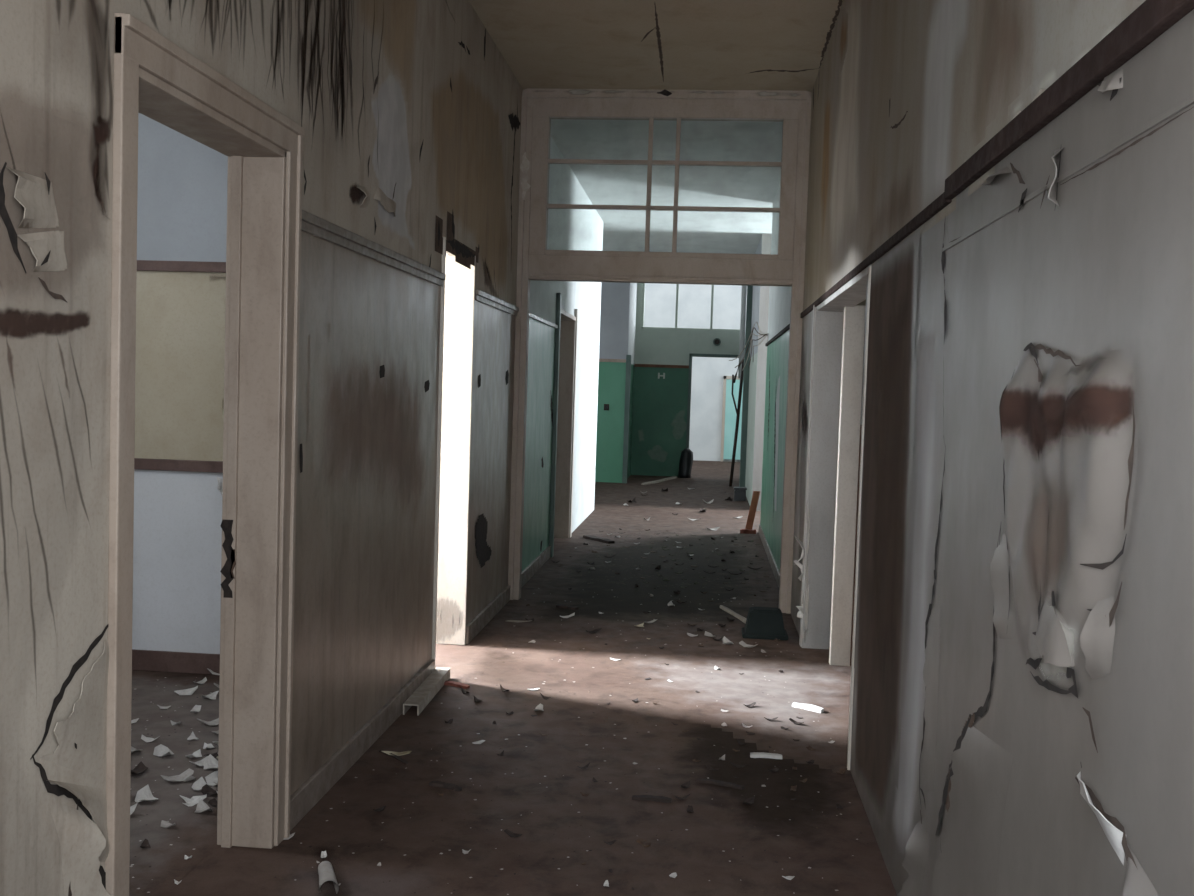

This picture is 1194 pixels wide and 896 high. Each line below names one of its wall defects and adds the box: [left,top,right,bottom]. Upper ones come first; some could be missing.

crack [458,29,486,58]
crack [641,4,664,82]
peeling [1040,148,1063,208]
peeling [0,162,70,302]
spalling [220,519,236,598]
spalling [475,513,492,568]
peeling [1075,771,1159,896]